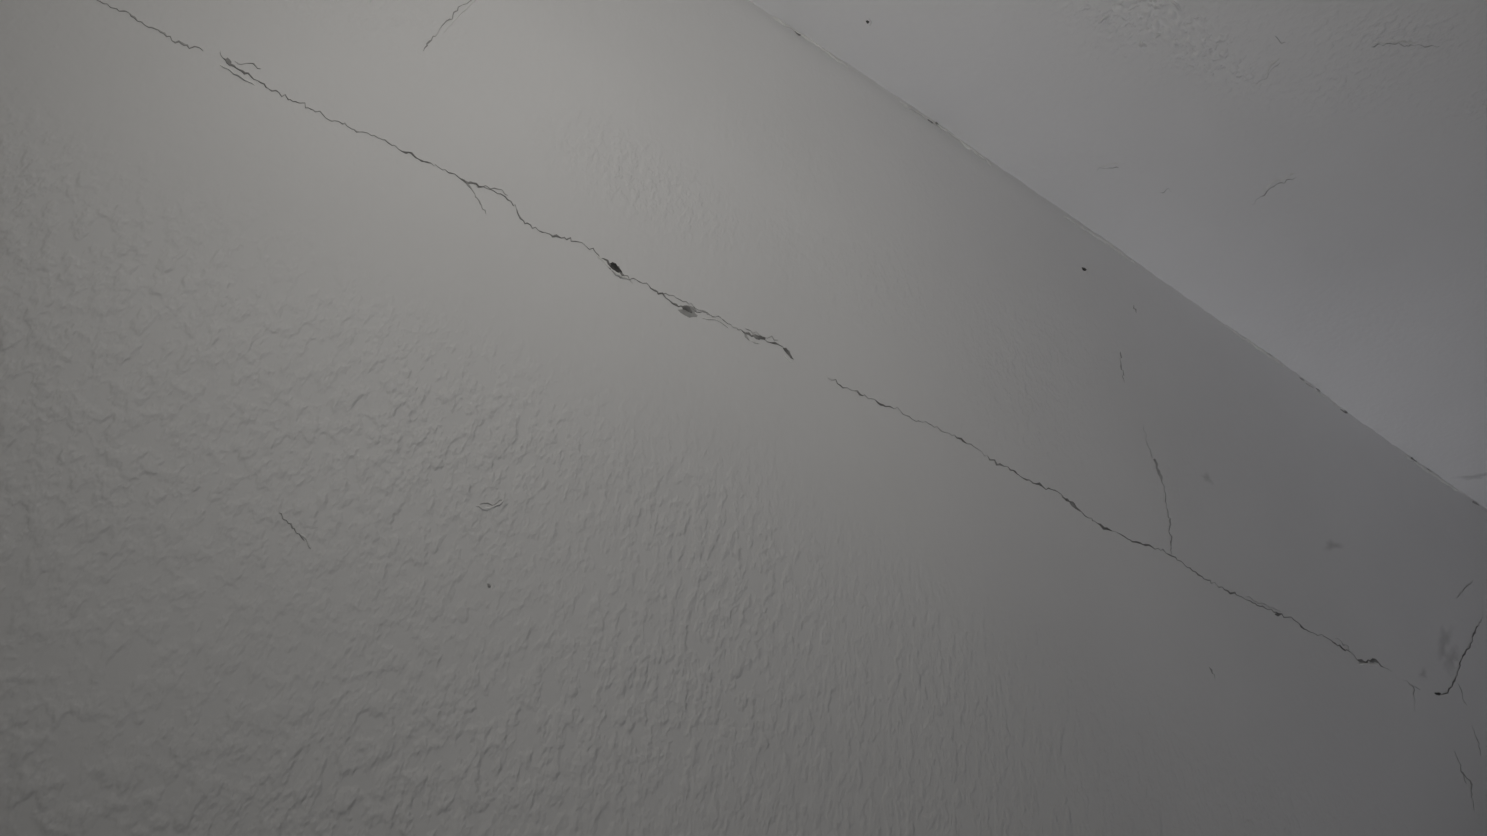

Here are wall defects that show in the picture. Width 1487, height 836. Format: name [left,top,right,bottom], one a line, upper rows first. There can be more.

crack [98,0,793,363]
crack [830,379,1482,806]